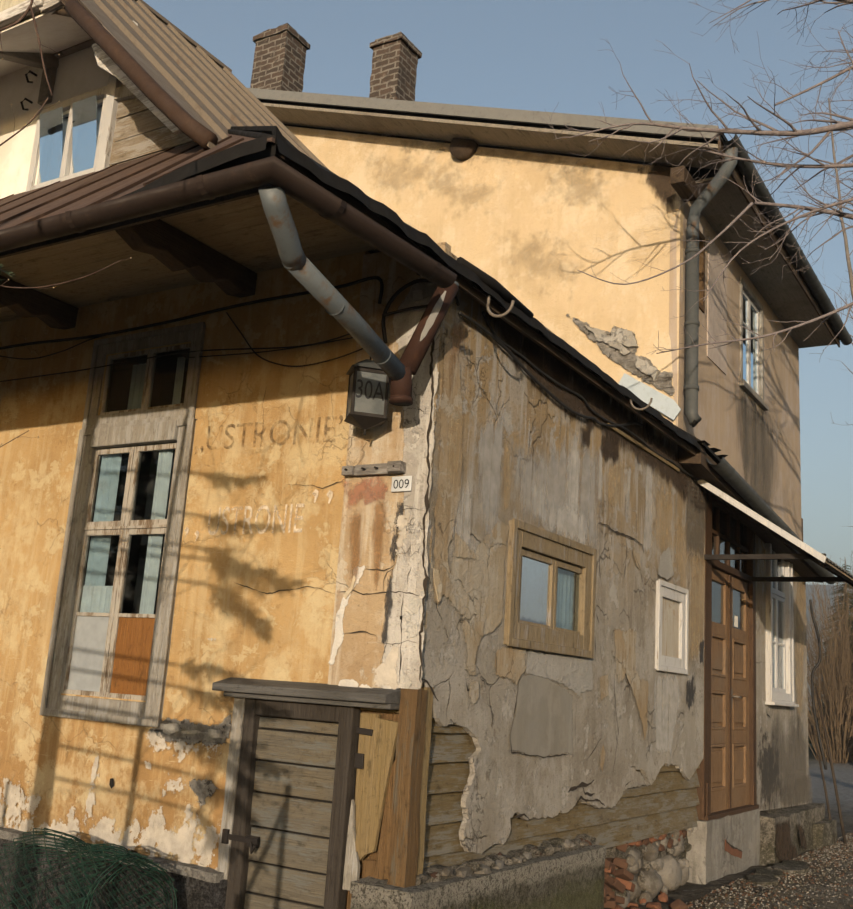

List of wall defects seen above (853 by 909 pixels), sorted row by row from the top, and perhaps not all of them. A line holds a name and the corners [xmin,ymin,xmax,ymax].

water stain [638,162,677,206]
flaking render [566,314,675,397]
crack [234,339,438,701]
peeling [338,276,509,704]
crack [598,522,644,582]
peeling [329,565,366,665]
peeling [495,628,648,740]
flaking render [145,714,232,763]
flaking render [162,773,218,808]